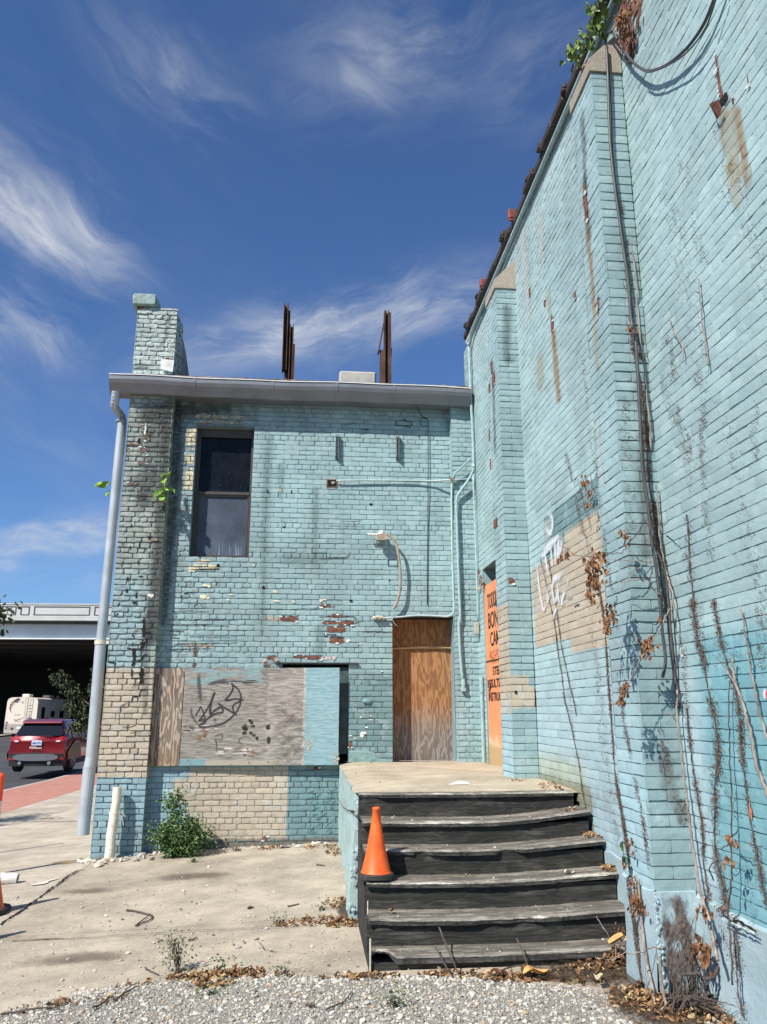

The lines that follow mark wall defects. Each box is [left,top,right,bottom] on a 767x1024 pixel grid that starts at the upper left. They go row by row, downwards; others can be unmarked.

corrosion [728,108,747,181]
corrosion [586,221,595,313]
spalling [126,423,153,465]
peeling [188,559,219,572]
spalling [293,599,360,661]
leakage [662,896,699,996]